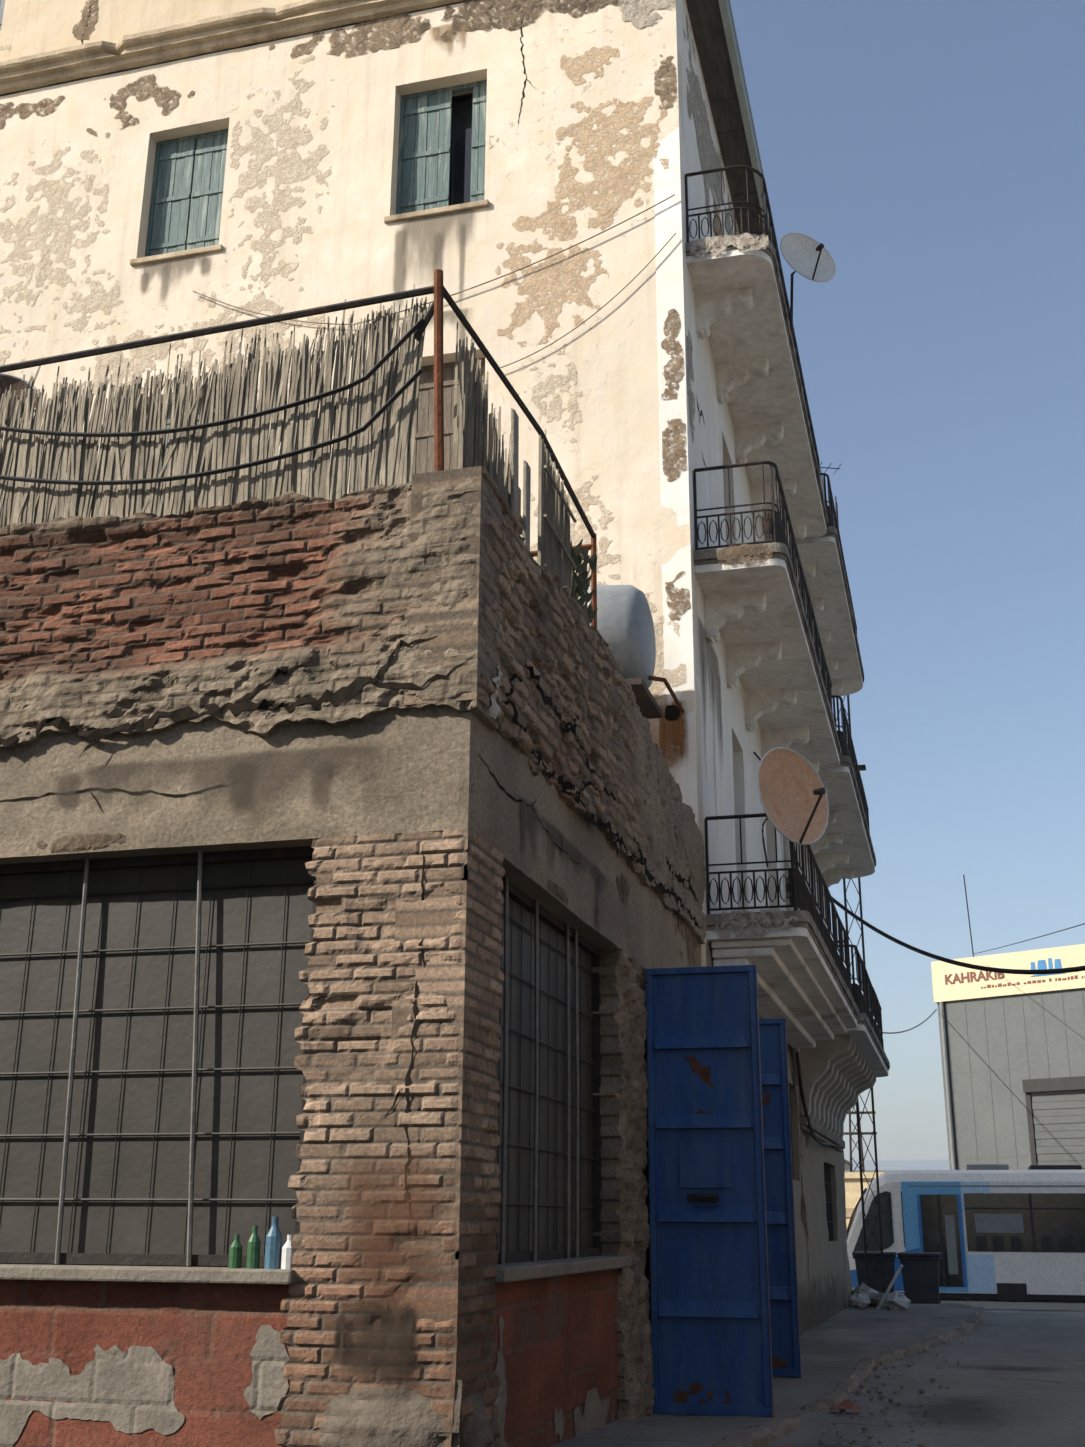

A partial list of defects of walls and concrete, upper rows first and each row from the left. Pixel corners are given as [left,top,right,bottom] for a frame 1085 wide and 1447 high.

peeling [0,0,769,450]
spalling [661,309,695,482]
peeling [530,493,538,562]
peeling [569,475,620,585]
peeling [644,571,690,719]
crack [0,636,703,929]
crack [375,939,425,1232]
rust [683,1055,715,1087]
peeling [0,1345,185,1447]
peeling [244,1325,290,1420]
peeling [554,1388,614,1441]
rust [674,1383,731,1405]